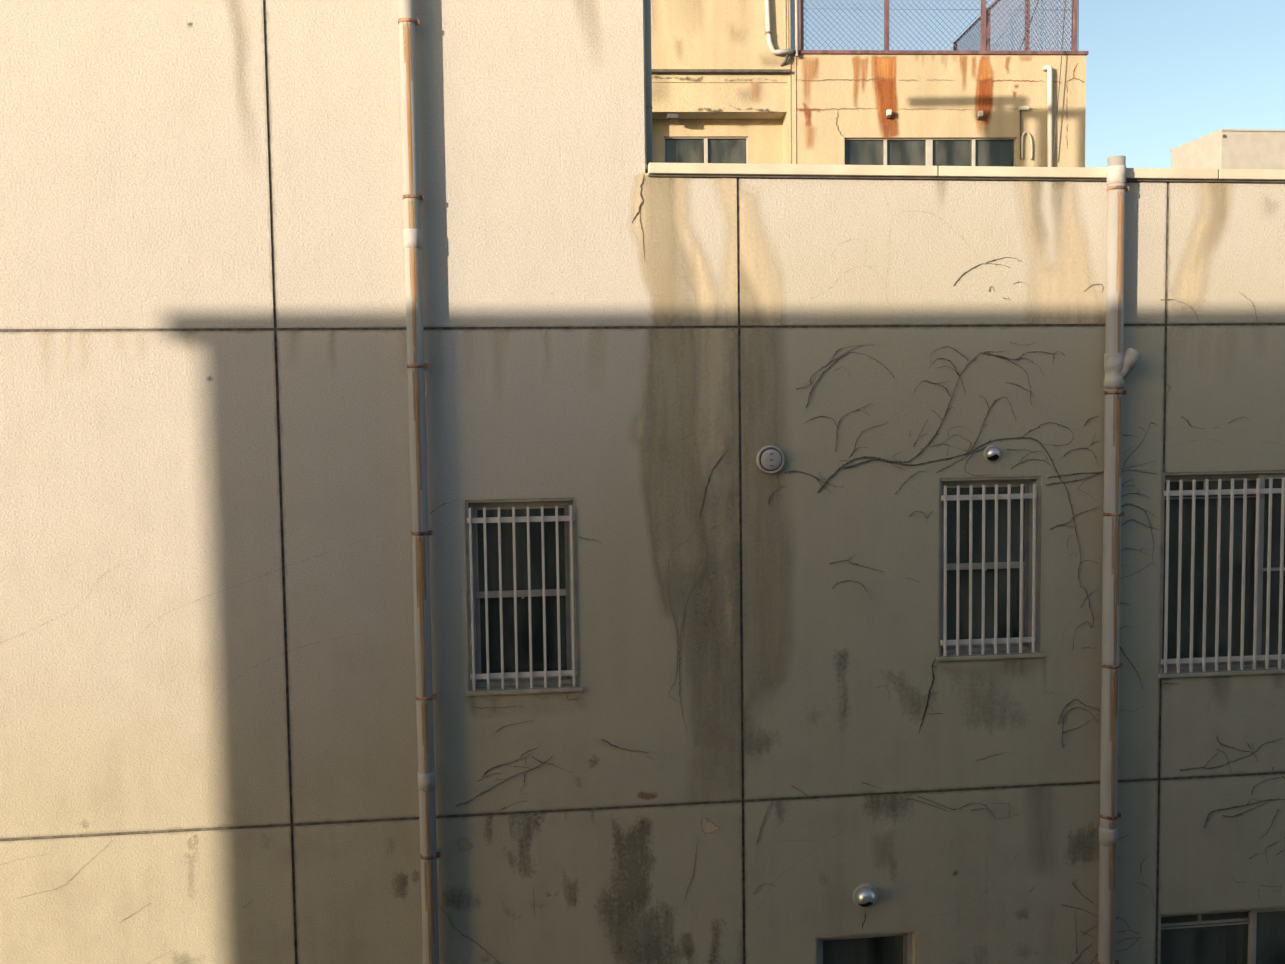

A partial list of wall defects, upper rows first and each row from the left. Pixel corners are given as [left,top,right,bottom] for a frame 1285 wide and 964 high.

corrosion [854,56,897,138]
corrosion [960,56,1009,128]
leakage [1174,182,1229,307]
leakage [632,175,786,772]
leakage [603,821,668,964]